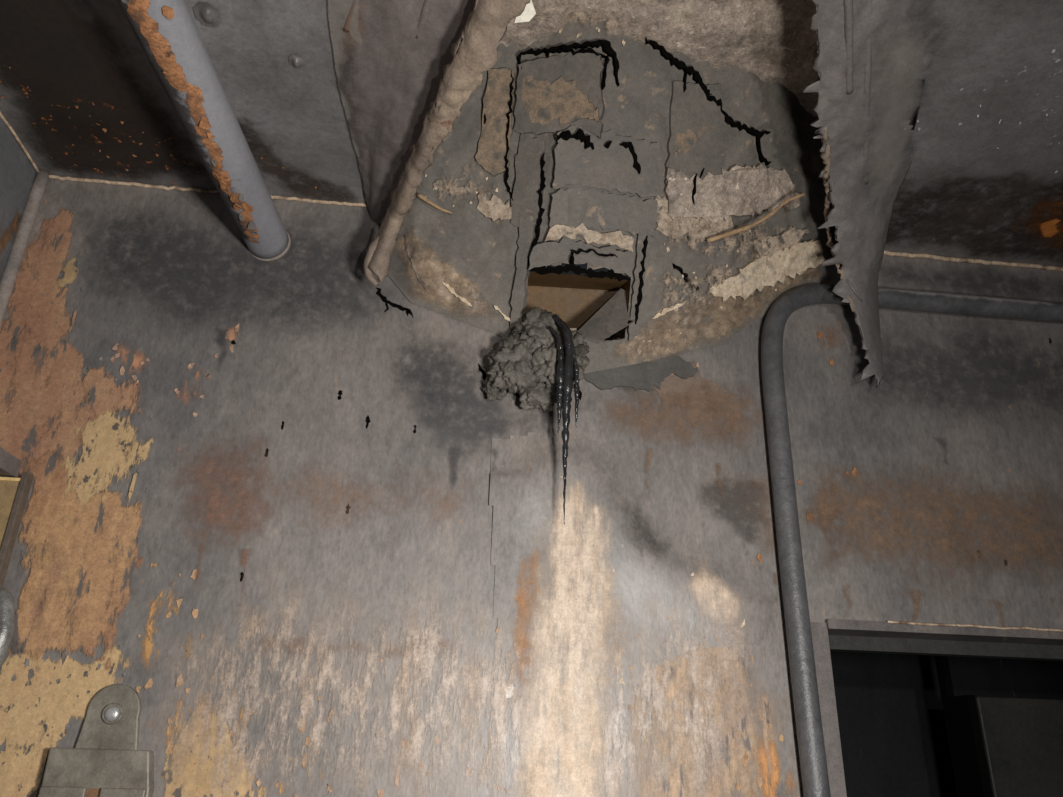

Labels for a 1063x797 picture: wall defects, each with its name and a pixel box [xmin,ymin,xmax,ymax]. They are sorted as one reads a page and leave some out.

rust [42,100,199,182]
rust [127,0,260,243]
crack [484,40,648,341]
crack [673,264,699,291]
crack [692,168,705,205]
crack [645,37,772,166]
rust [1040,218,1061,237]
peeling [0,208,158,797]
peeling [138,591,183,662]
water stain [186,476,784,797]